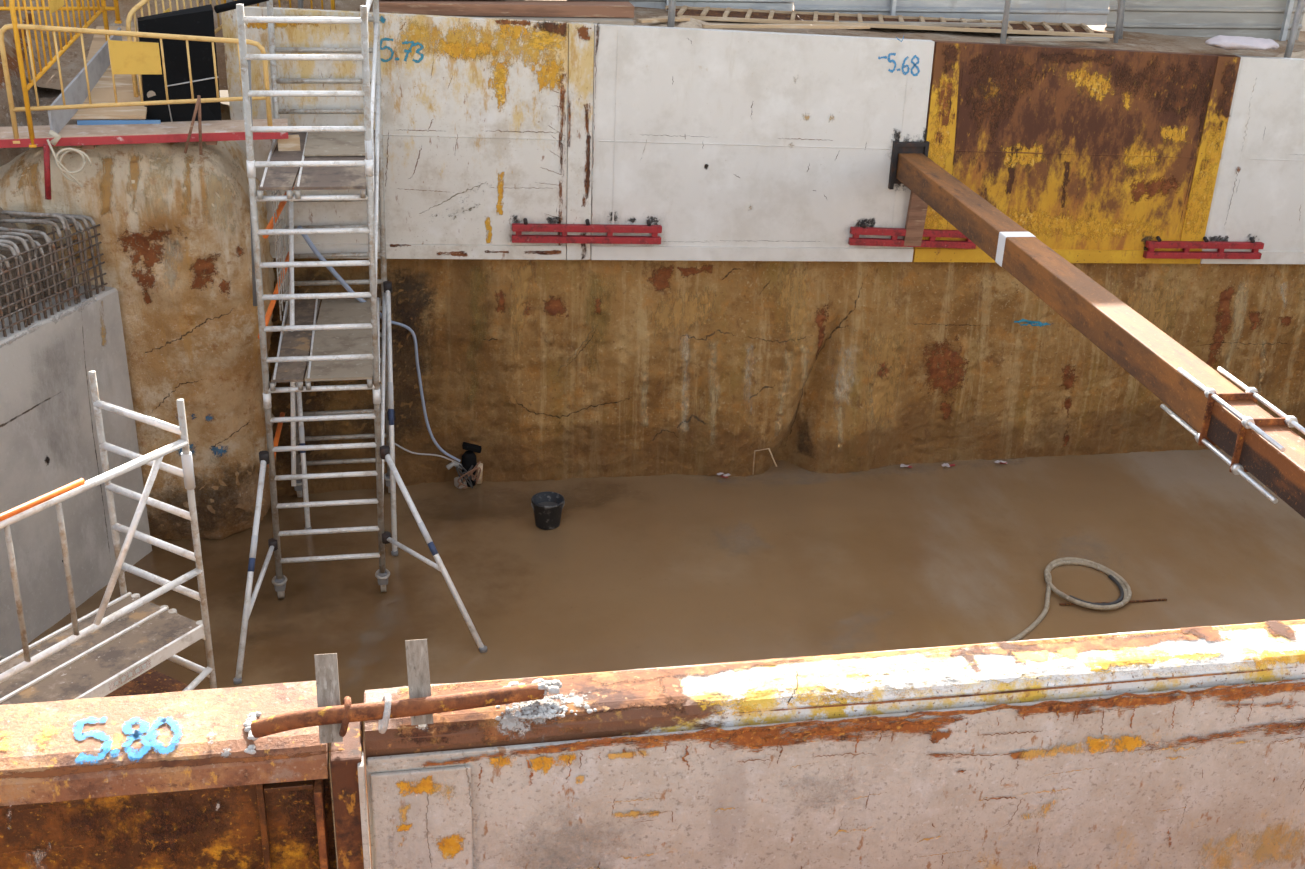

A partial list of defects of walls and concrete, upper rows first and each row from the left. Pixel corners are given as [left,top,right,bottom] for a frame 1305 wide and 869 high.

peeling [246,16,318,29]
peeling [395,18,566,111]
rust [484,19,599,259]
rust [1005,146,1018,193]
rust [1061,162,1070,208]
rust [934,45,1236,181]
rust [1129,175,1179,204]
rust [1206,287,1235,367]
rust [392,619,1305,790]
peeling [681,643,1305,716]
rust [0,749,344,778]
rust [288,779,334,860]